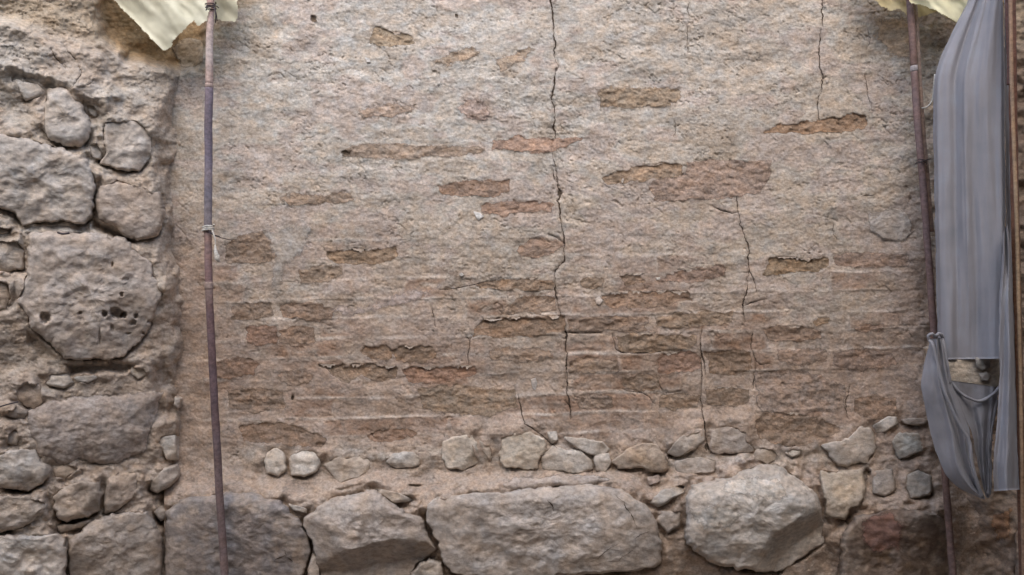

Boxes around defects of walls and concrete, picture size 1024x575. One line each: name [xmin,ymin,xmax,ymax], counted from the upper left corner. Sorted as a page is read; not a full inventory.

crack [817,1,825,117]
spalling [598,86,681,109]
spalling [763,113,868,134]
spalling [345,135,583,160]
spalling [438,179,554,221]
spalling [602,159,772,202]
crack [549,0,708,445]
spalling [299,246,398,284]
spalling [763,252,910,276]
crack [714,196,769,388]
spalling [473,264,899,447]
spalling [216,345,518,447]